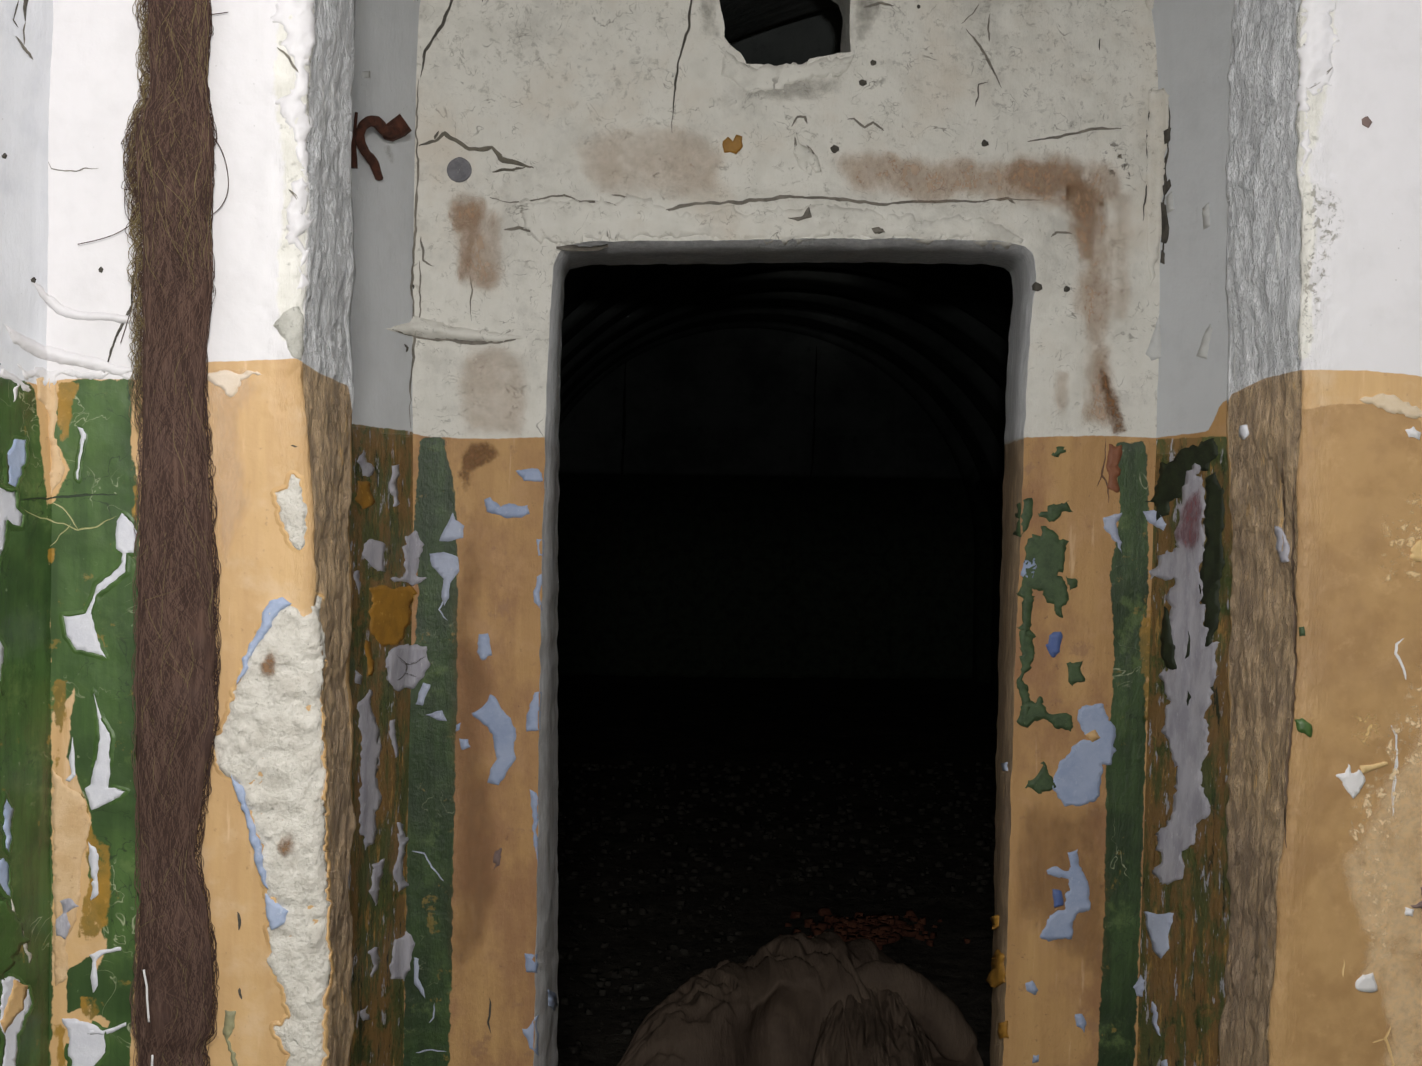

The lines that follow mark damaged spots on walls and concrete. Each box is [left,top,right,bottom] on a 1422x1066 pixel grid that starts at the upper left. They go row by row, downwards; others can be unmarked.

crack [671,0,692,128]
crack [404,0,628,427]
crack [666,195,1040,211]
peeling [0,435,30,565]
peeling [0,790,35,1066]
peeling [51,687,130,986]
peeling [62,1018,126,1066]
peeling [59,510,139,661]
peeling [353,513,542,906]
peeling [1013,498,1116,807]
rust [1091,362,1125,433]
peeling [1143,438,1225,885]